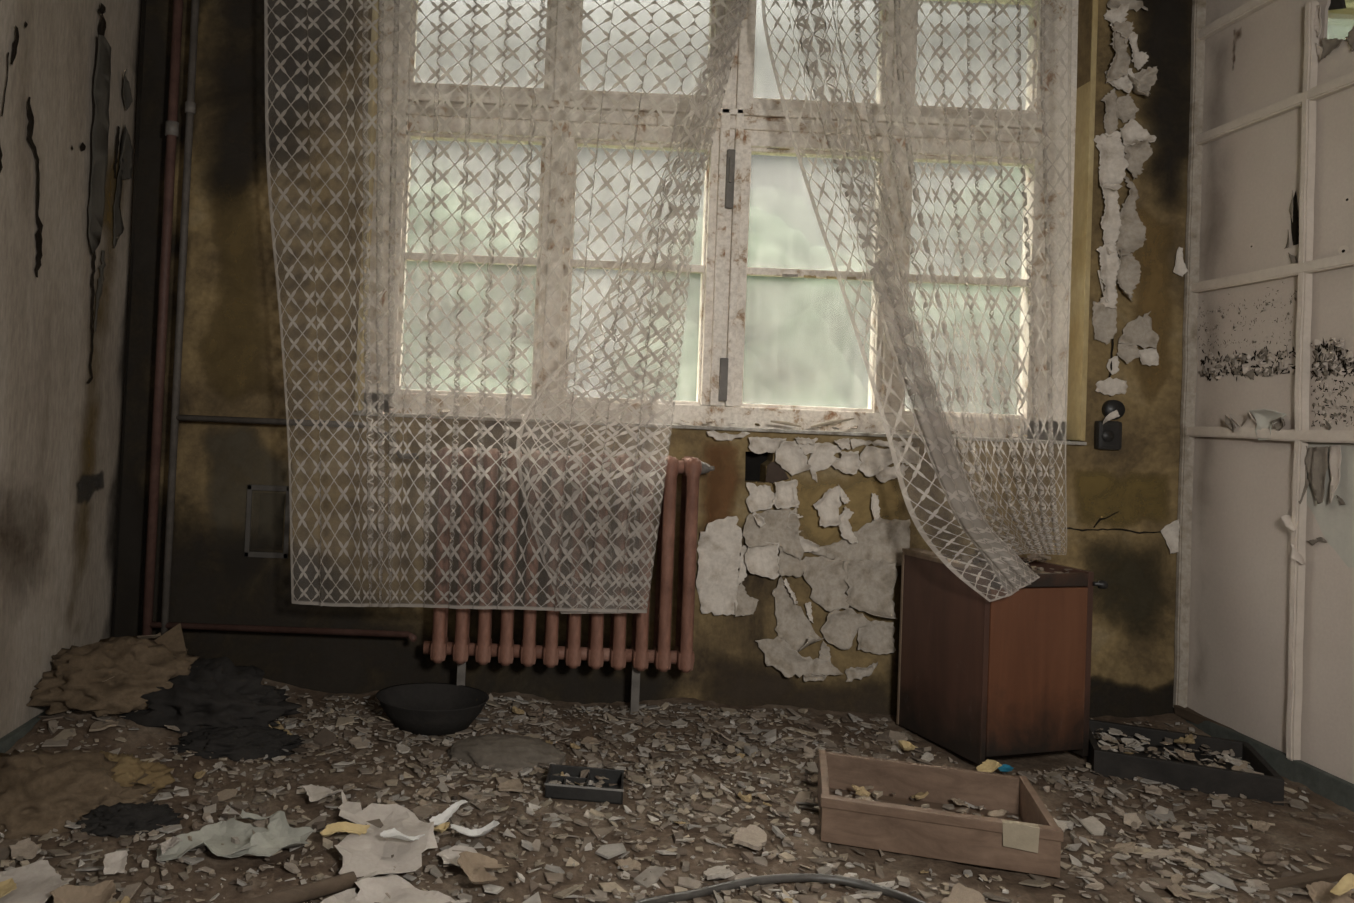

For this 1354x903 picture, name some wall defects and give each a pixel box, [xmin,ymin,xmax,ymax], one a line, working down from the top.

hole [1314,5,1354,62]
peeling [1092,0,1159,396]
water stain [1076,472,1167,525]
peeling [696,430,921,682]
water stain [1090,545,1164,633]
water stain [1089,677,1175,718]